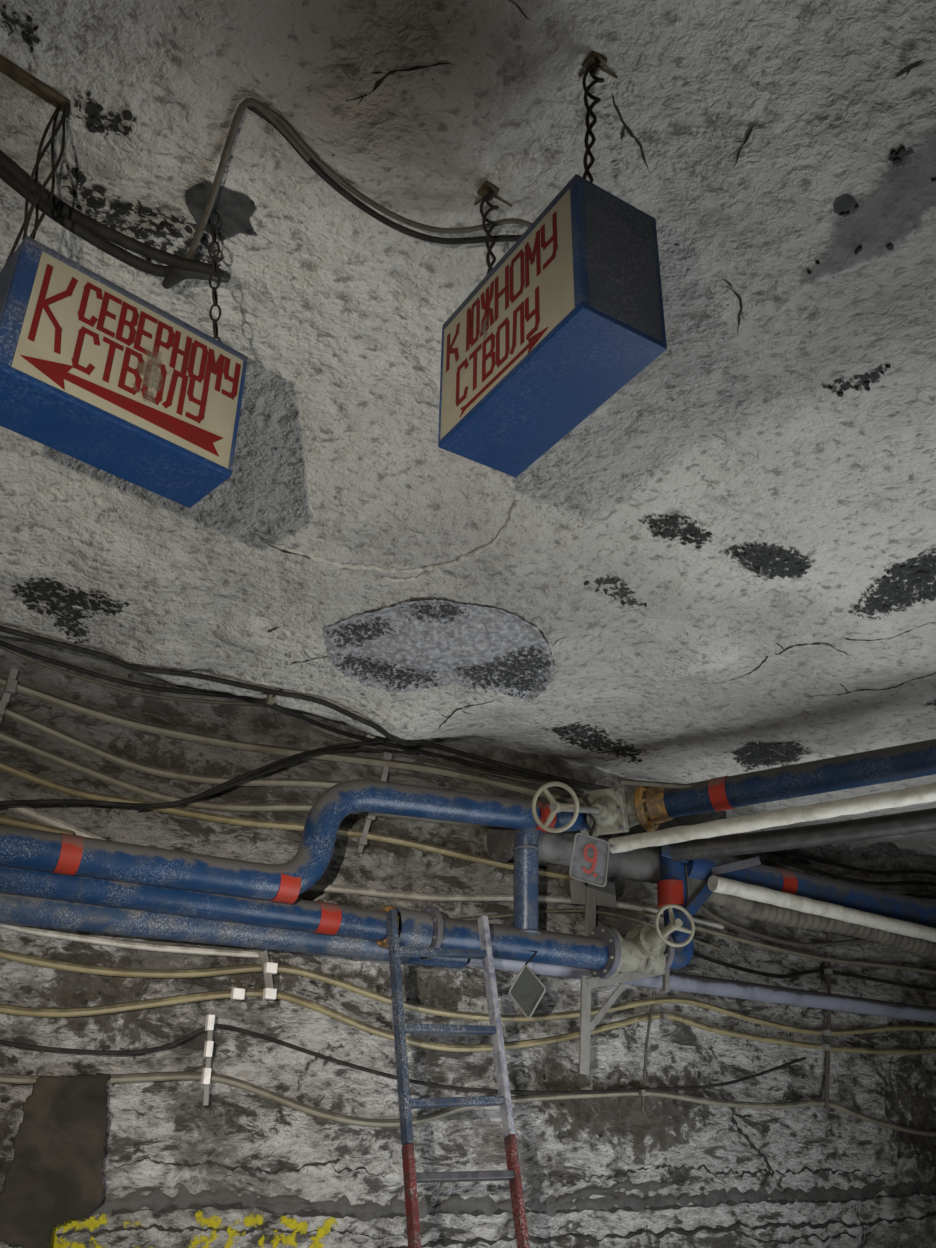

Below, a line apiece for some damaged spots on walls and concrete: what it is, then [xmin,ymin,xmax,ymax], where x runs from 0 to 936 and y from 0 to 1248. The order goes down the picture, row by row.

crack [347,62,457,104]
crack [722,279,743,327]
crack [46,1091,936,1248]